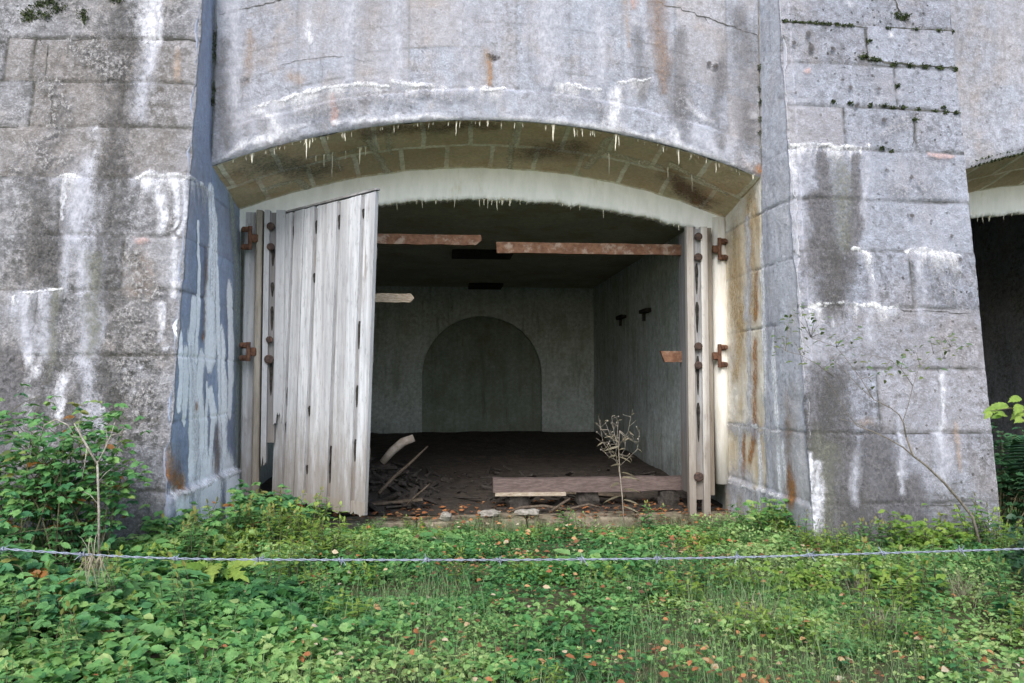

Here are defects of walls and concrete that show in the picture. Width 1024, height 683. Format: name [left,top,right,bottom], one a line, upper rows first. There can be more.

crack [664,5,758,36]
leakage [0,0,242,525]
leakage [787,143,896,340]
corrosion [165,451,185,496]
corrosion [741,340,757,480]
leakage [803,360,934,543]
leakage [933,374,951,487]